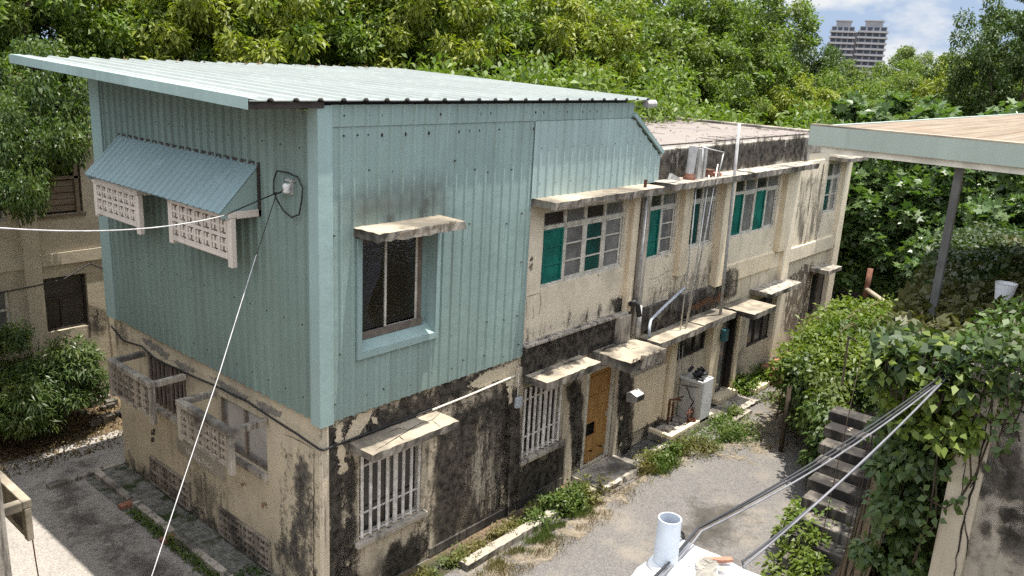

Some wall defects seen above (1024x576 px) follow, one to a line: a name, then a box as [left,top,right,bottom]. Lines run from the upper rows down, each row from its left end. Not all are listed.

water stain [658,134,807,180]
water stain [796,164,827,246]
water stain [246,297,634,576]
water stain [979,415,1024,564]